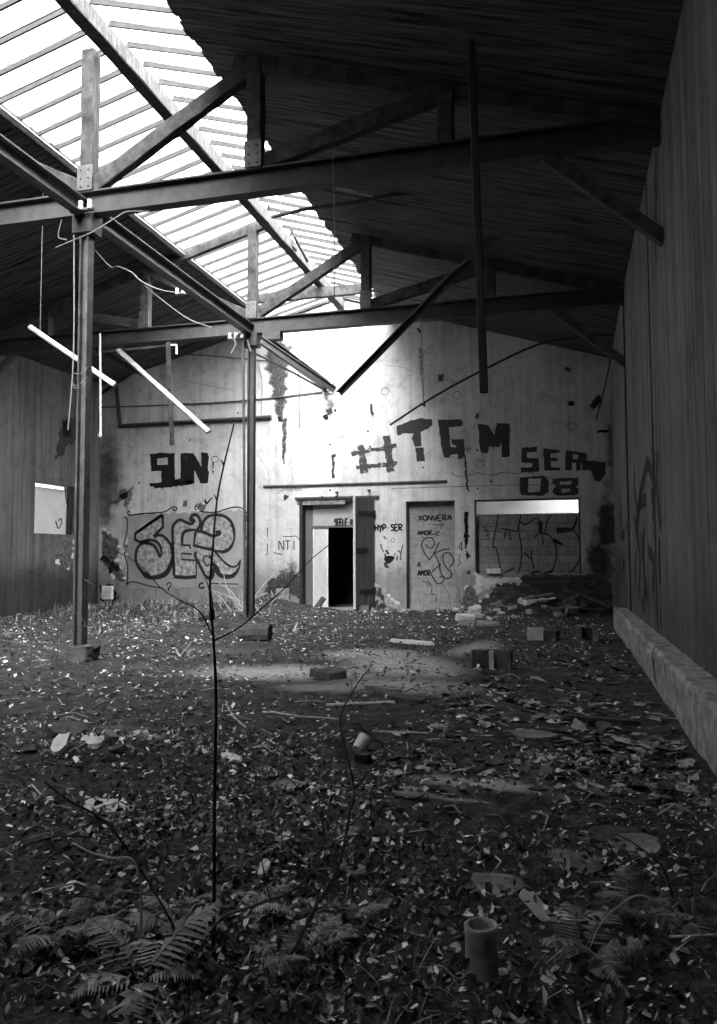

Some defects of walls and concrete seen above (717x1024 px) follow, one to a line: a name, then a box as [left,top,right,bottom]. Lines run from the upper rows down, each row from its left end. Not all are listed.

leakage [264,341,293,464]
spalling [102,528,126,582]
spalling [461,568,613,609]